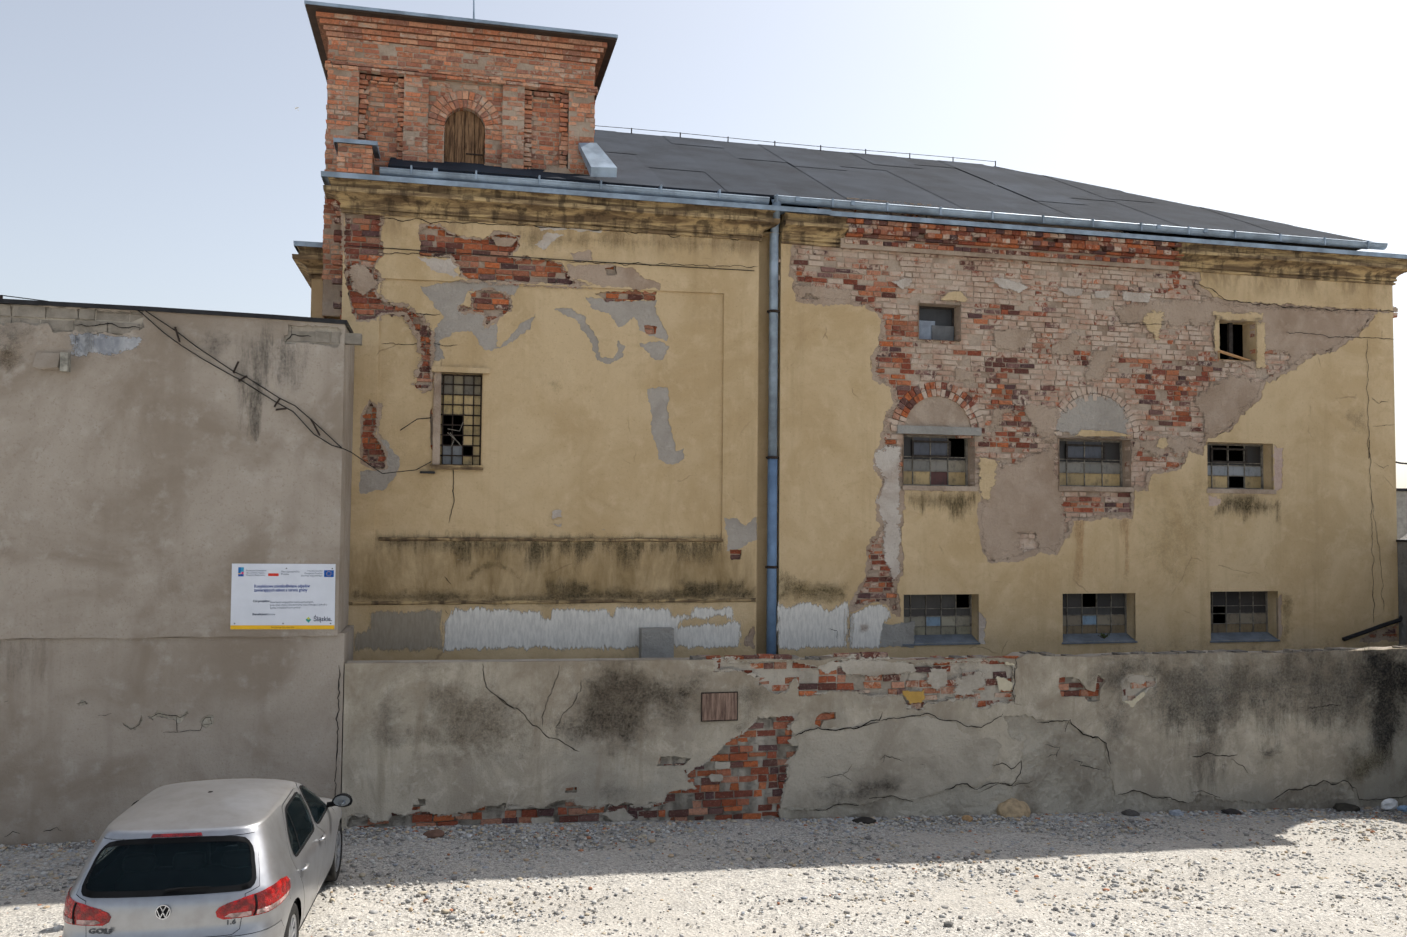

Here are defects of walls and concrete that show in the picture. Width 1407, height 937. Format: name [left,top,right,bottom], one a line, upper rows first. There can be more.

flaking render [816,198,1124,233]
flaking render [284,199,669,393]
crack [1198,284,1395,623]
flaking render [344,232,1407,828]
crack [78,701,212,732]
crack [483,666,581,752]
water stain [572,672,690,741]
crack [795,657,1220,811]
water stain [1155,654,1407,776]
crack [1273,780,1405,800]